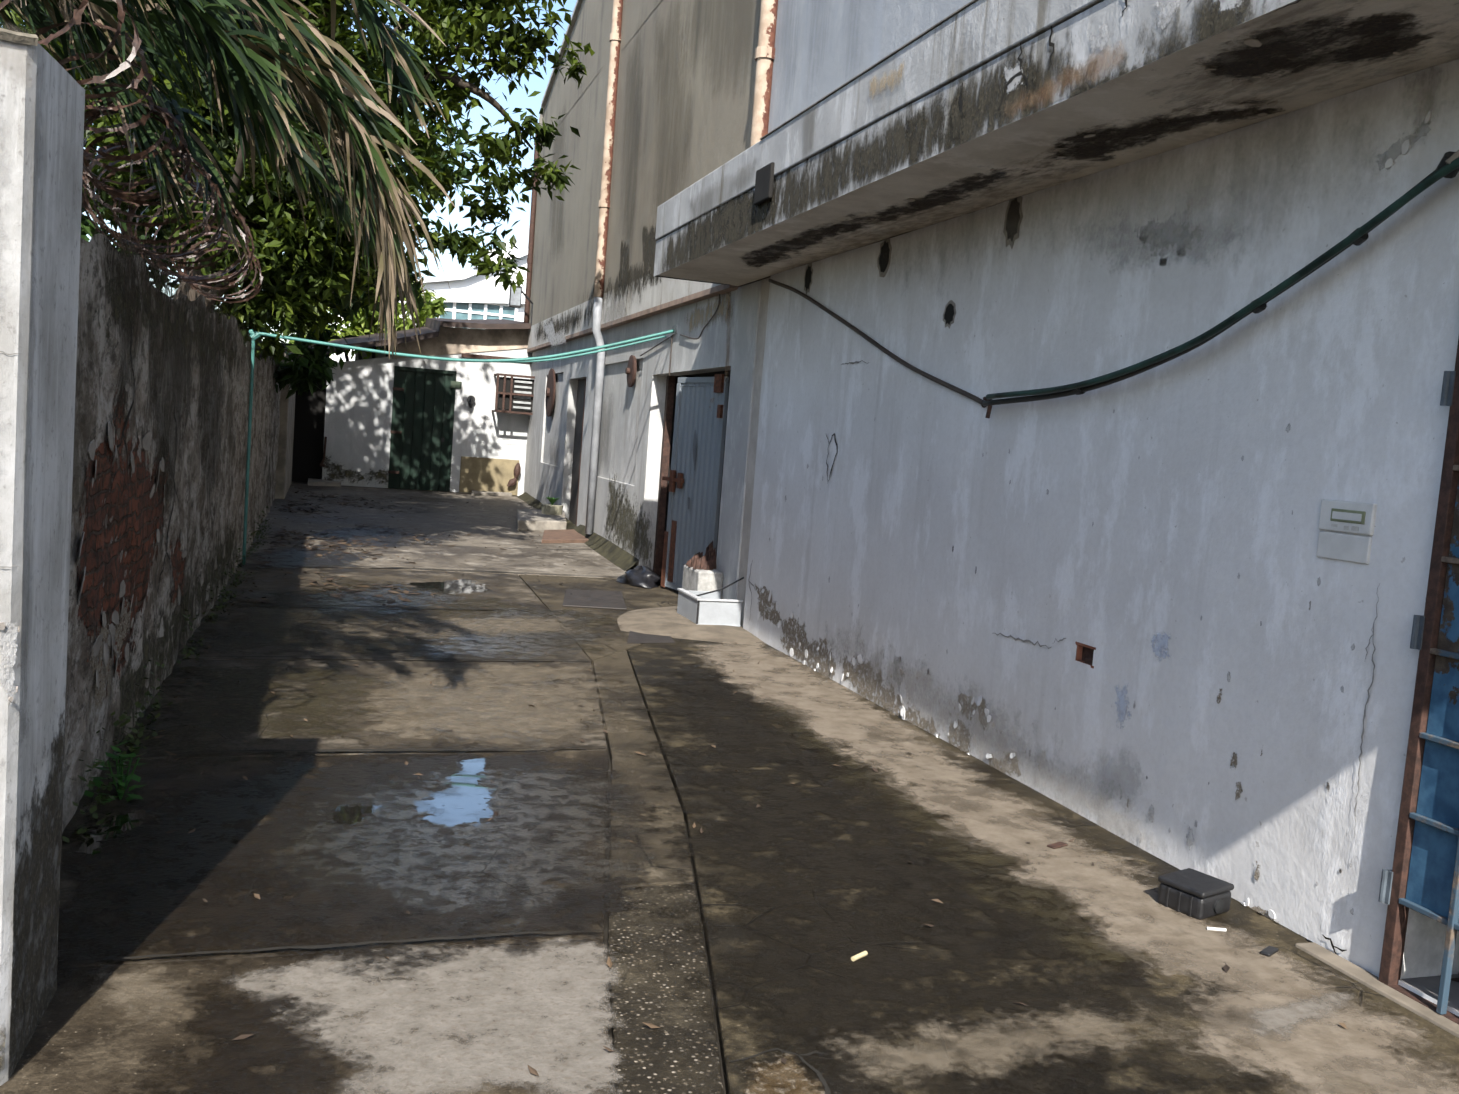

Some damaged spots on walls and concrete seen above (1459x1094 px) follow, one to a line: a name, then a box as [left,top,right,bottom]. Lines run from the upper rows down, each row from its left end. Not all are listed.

leakage [536,0,1253,340]
peeling [1004,63,1023,94]
peeling [1155,0,1180,30]
peeling [1214,0,1244,11]
flaking render [76,383,187,723]
flaking render [755,583,1031,777]
crack [1354,584,1380,837]